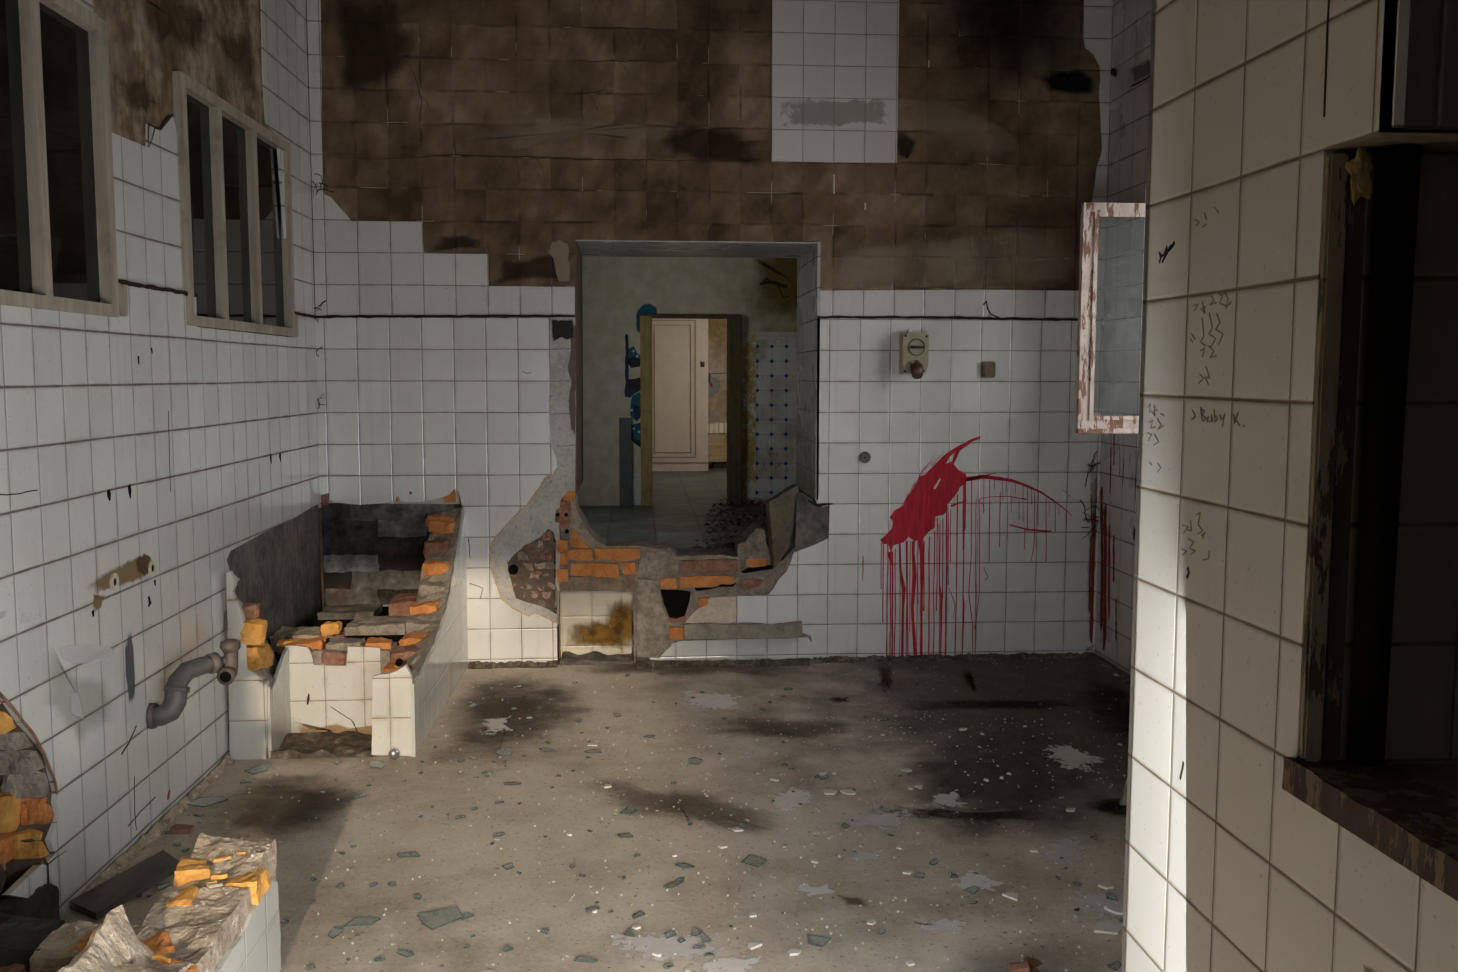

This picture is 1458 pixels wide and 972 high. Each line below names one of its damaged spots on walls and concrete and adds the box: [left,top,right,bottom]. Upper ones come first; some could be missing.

peeling [92,0,271,146]
peeling [321,0,1102,291]
damp [762,258,797,312]
spalling [318,493,336,508]
spalling [386,489,460,504]
spalling [794,493,833,551]
spalling [0,692,60,921]